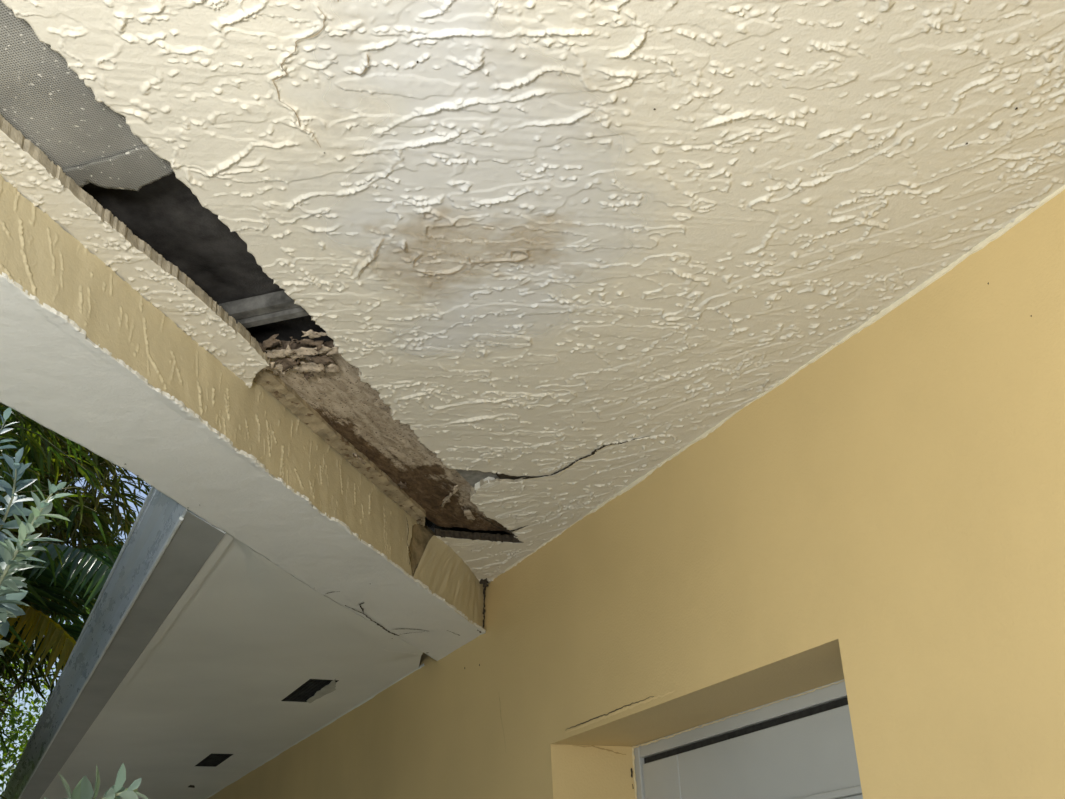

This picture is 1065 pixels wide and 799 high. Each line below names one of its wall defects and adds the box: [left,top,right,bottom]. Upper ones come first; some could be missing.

crack [272,0,338,145]
peeling [259,330,342,381]
crack [492,436,649,480]
peeling [440,485,459,507]
crack [327,591,425,636]
crack [450,587,486,635]